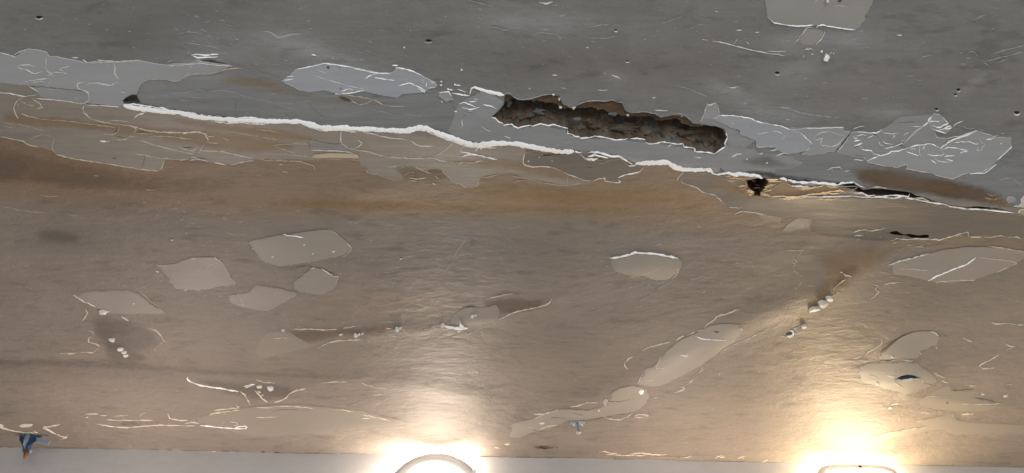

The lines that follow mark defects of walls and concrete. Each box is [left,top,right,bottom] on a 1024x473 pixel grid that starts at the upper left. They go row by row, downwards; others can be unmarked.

crack [0,54,1012,213]
peeling [0,49,1024,248]
crack [86,377,388,452]